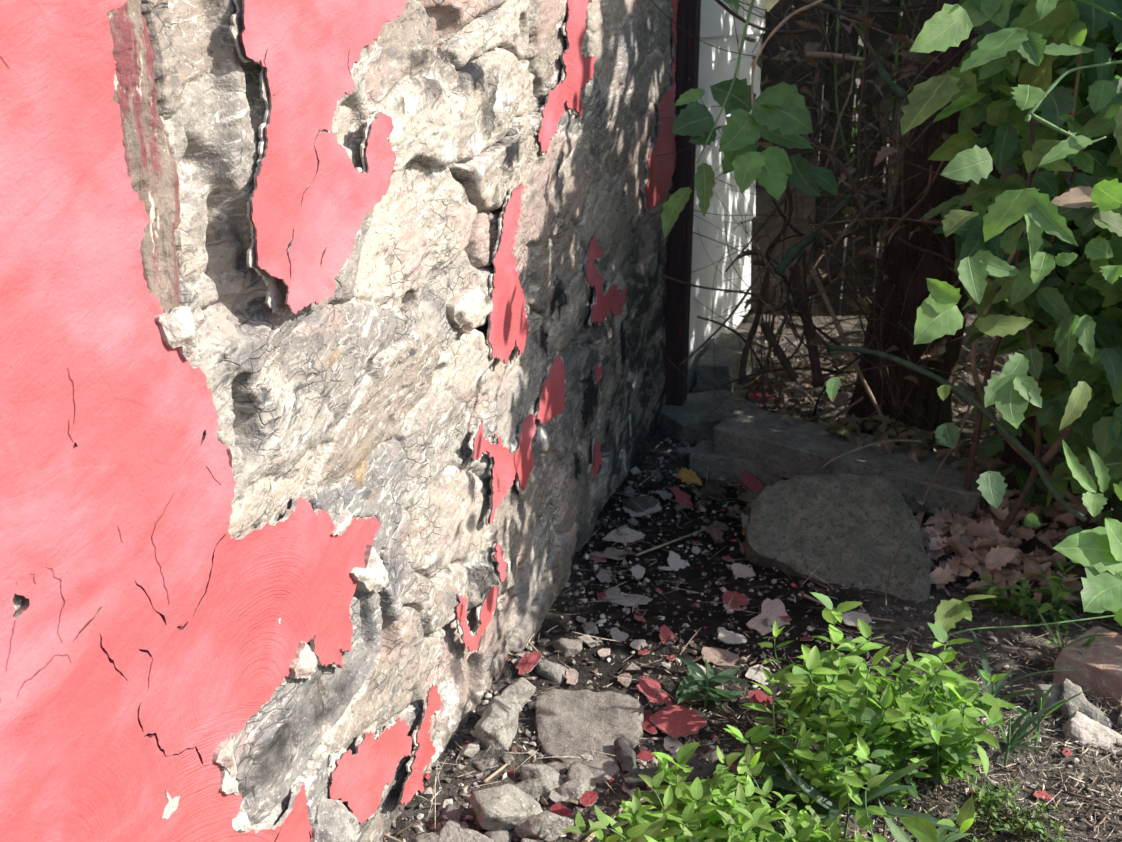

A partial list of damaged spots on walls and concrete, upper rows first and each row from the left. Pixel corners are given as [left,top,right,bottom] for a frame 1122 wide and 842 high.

peeling [534,0,596,155]
peeling [229,0,407,315]
peeling [486,182,529,364]
peeling [468,351,565,525]
crack [0,567,72,701]
crack [151,492,175,601]
peeling [161,789,180,819]
peeling [327,684,442,825]
peeling [455,543,507,652]
flaking render [566,668,579,685]
flaking render [602,495,662,578]
peeling [637,676,707,754]